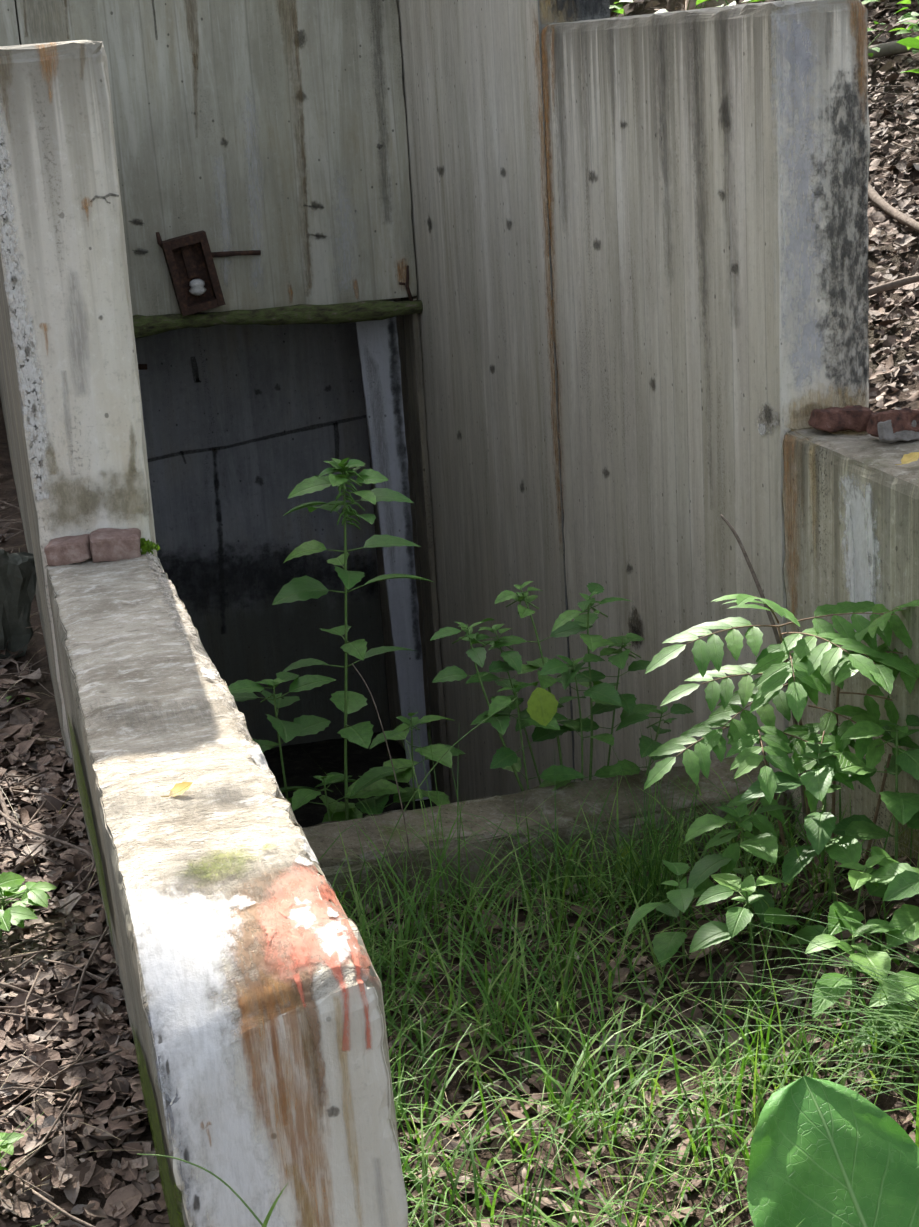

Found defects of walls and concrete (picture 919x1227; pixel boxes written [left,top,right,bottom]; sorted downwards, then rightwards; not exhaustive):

rust [535,25,563,525]
water stain [813,63,869,406]
water stain [157,448,377,634]
peeling [288,884,354,965]
rust [239,977,329,1227]